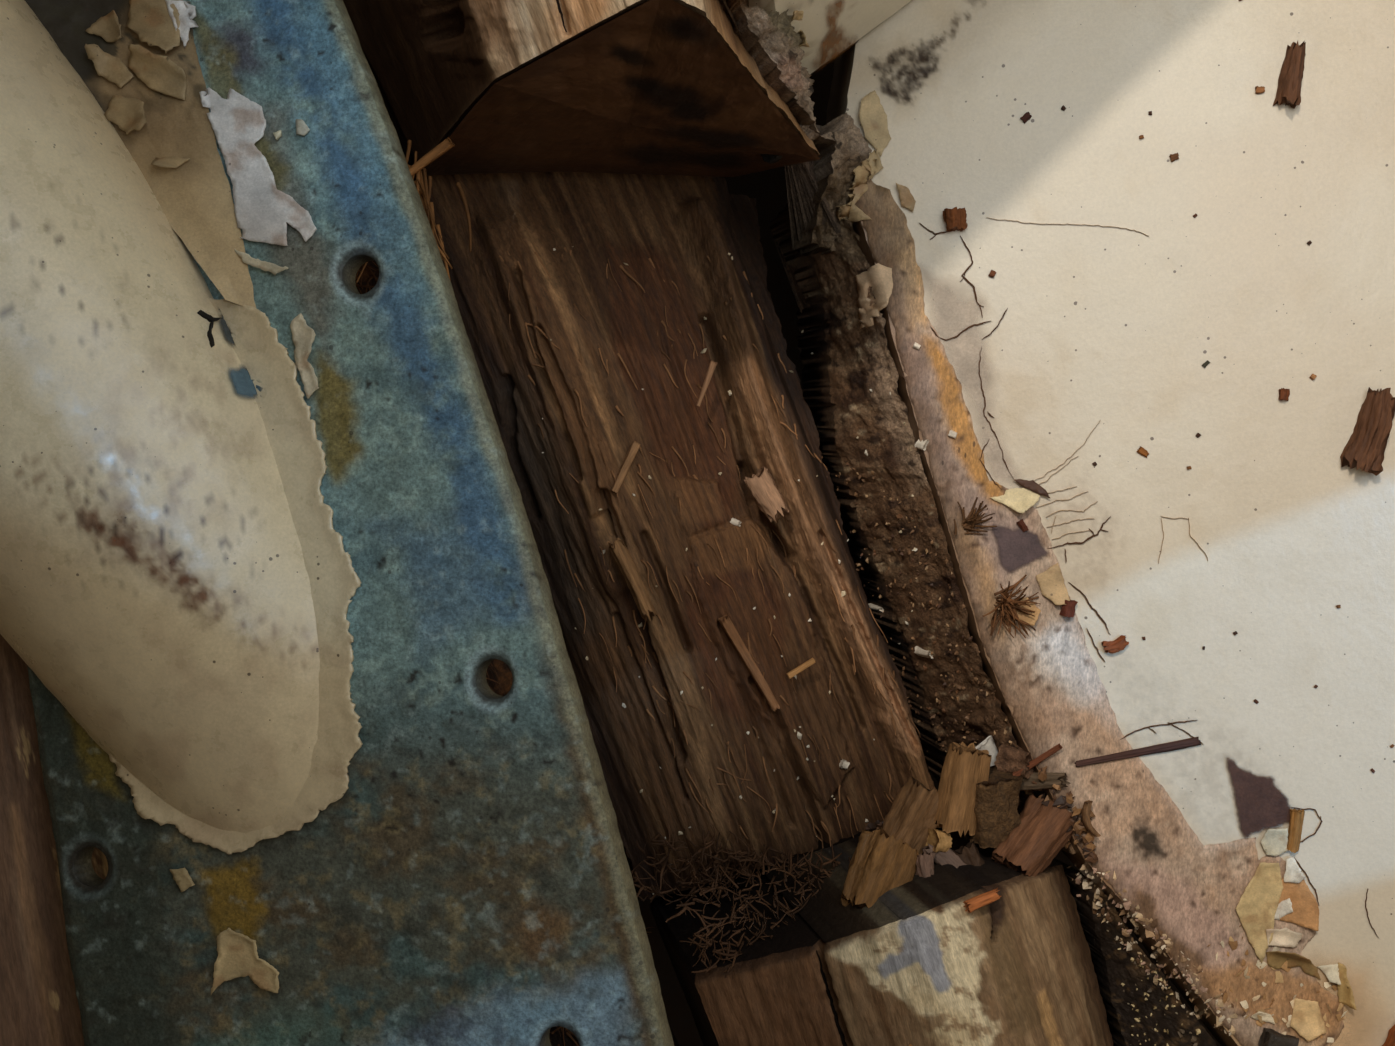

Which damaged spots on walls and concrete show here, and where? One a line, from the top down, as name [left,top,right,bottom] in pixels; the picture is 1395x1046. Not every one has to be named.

mould [874,17,968,101]
crack [920,217,1148,661]
peeling [770,90,1357,1046]
crack [1158,516,1208,564]